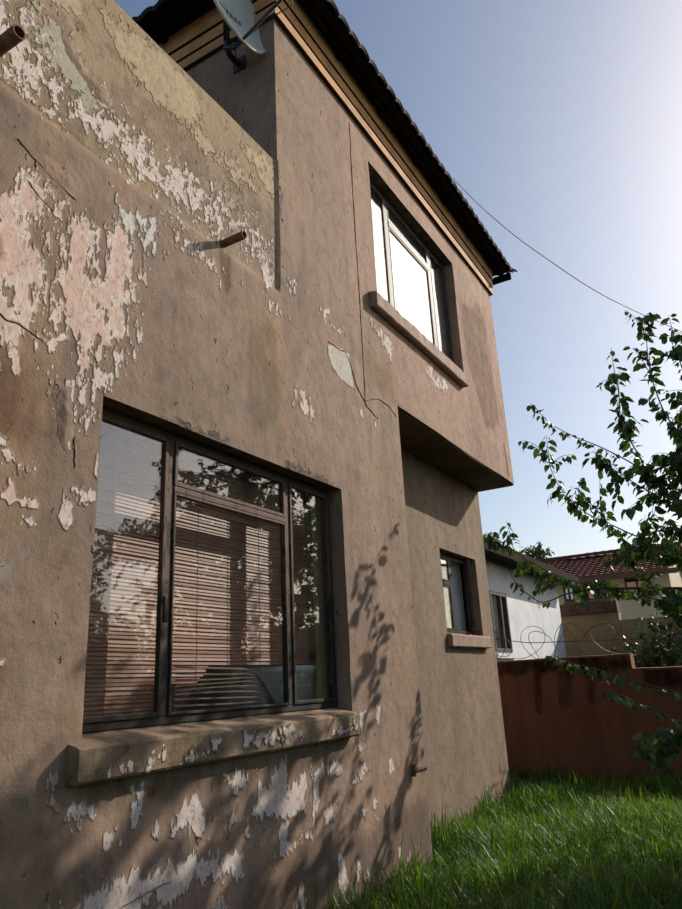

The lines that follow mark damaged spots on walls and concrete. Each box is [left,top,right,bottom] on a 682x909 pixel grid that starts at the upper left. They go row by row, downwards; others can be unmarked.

crack [18,139,77,211]
peeling [0,0,297,451]
crack [329,122,396,418]
crack [0,313,45,342]
peeling [316,301,355,389]
peeling [369,315,414,366]
peeling [425,362,448,395]
peeling [45,768,97,840]
peeling [104,744,168,831]
peeling [221,703,381,864]
peeling [47,789,245,909]
peeling [337,852,371,898]